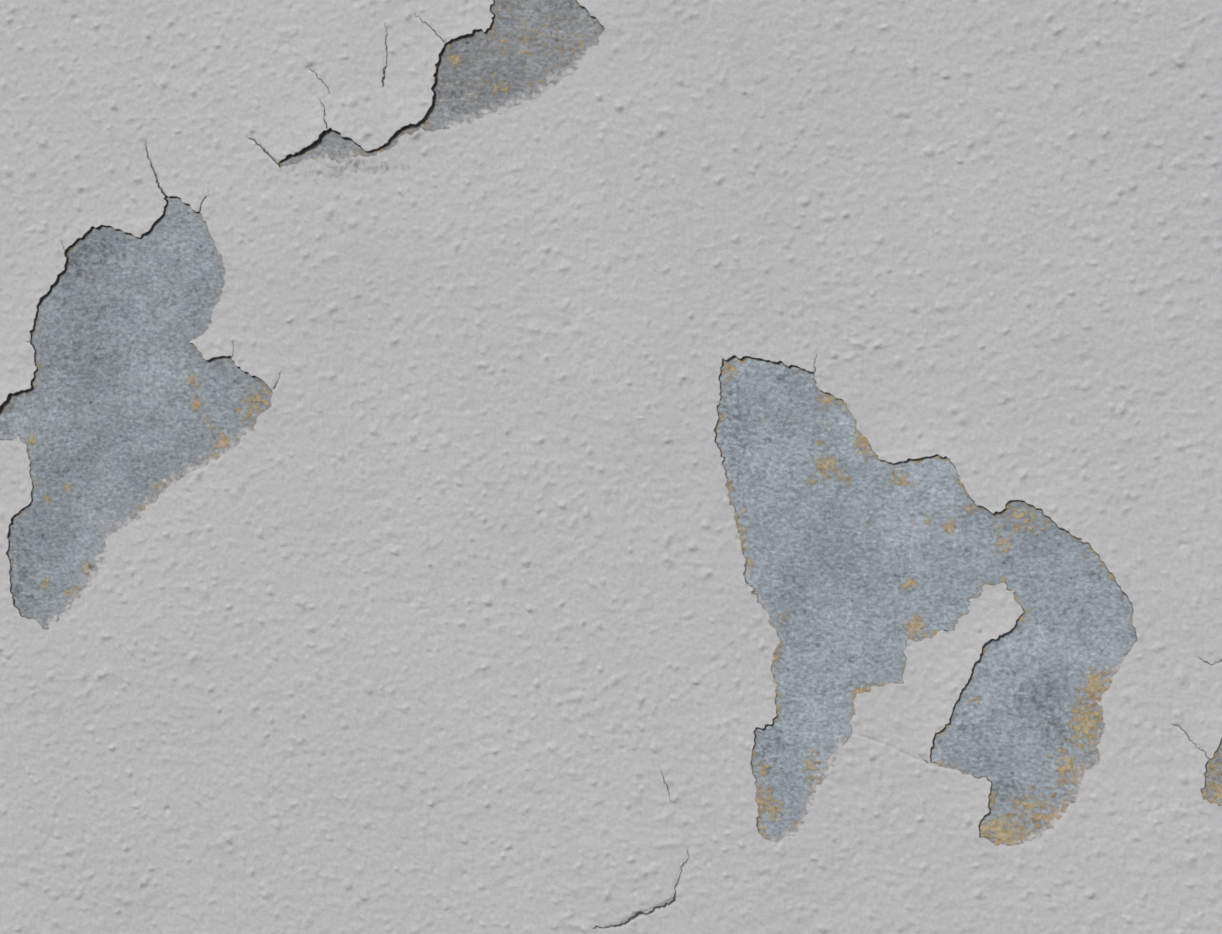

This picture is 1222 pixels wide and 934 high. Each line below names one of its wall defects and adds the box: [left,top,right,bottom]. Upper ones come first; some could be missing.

peeling [247,0,605,168]
peeling [0,140,280,630]
peeling [714,354,1137,846]
peeling [1172,724,1222,807]
crack [591,849,690,929]